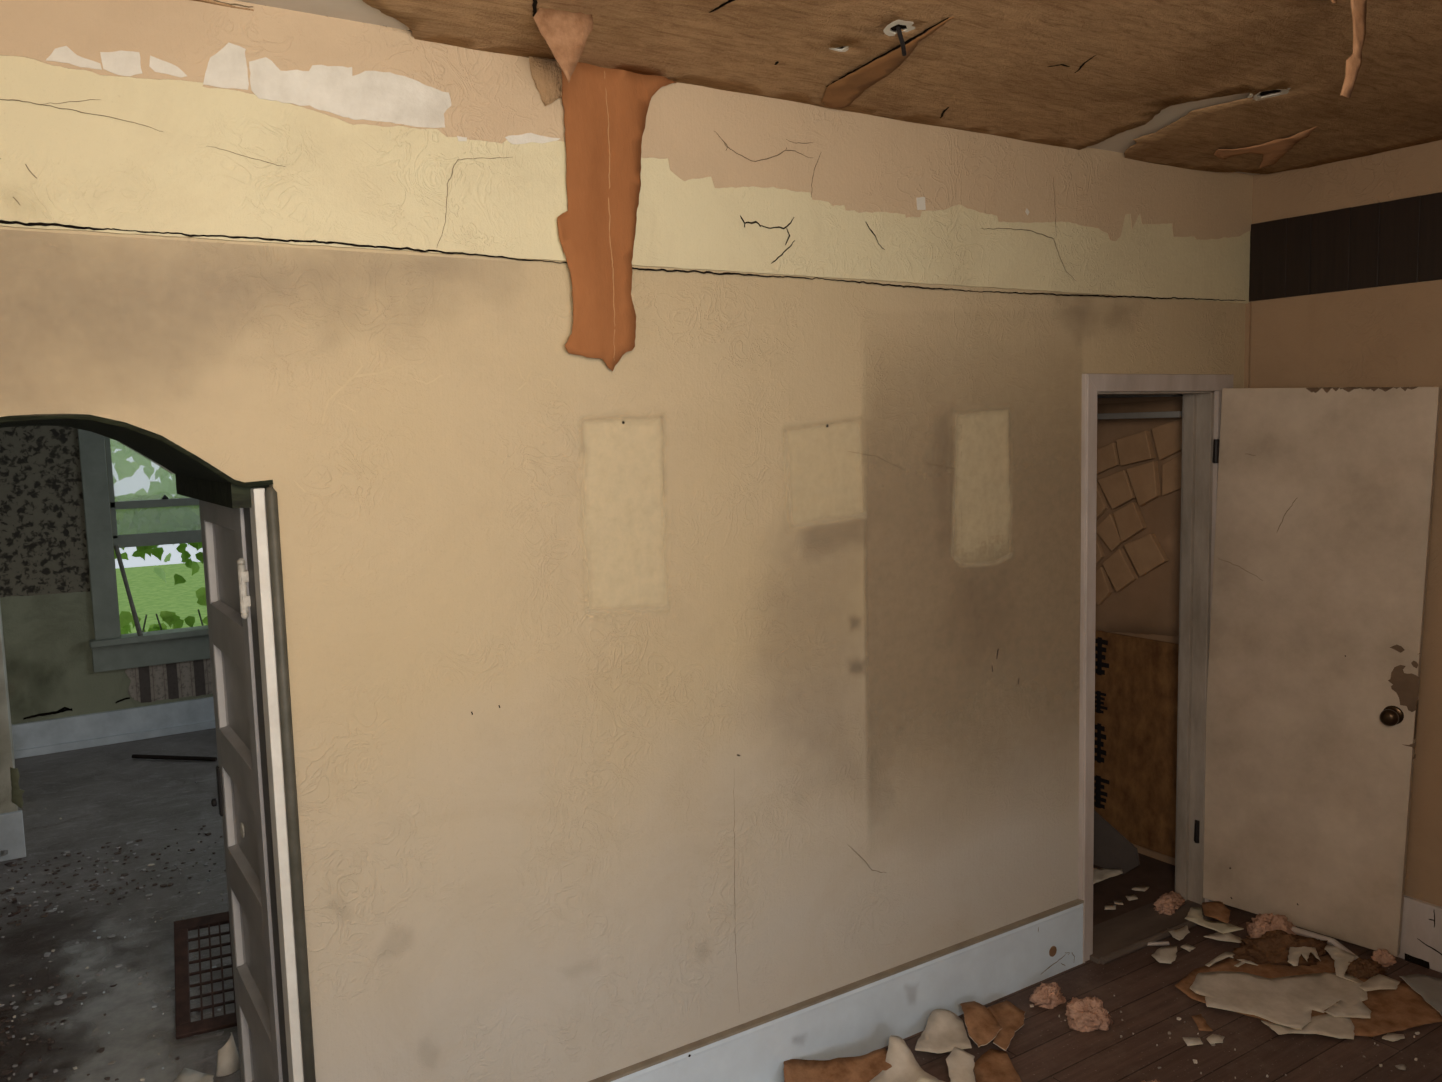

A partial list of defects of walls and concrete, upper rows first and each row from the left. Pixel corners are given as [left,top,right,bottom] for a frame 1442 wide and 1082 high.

peeling [0,0,565,144]
crack [531,0,539,17]
crack [709,0,735,13]
crack [0,157,567,264]
crack [632,134,1246,301]
peeling [641,82,1253,241]